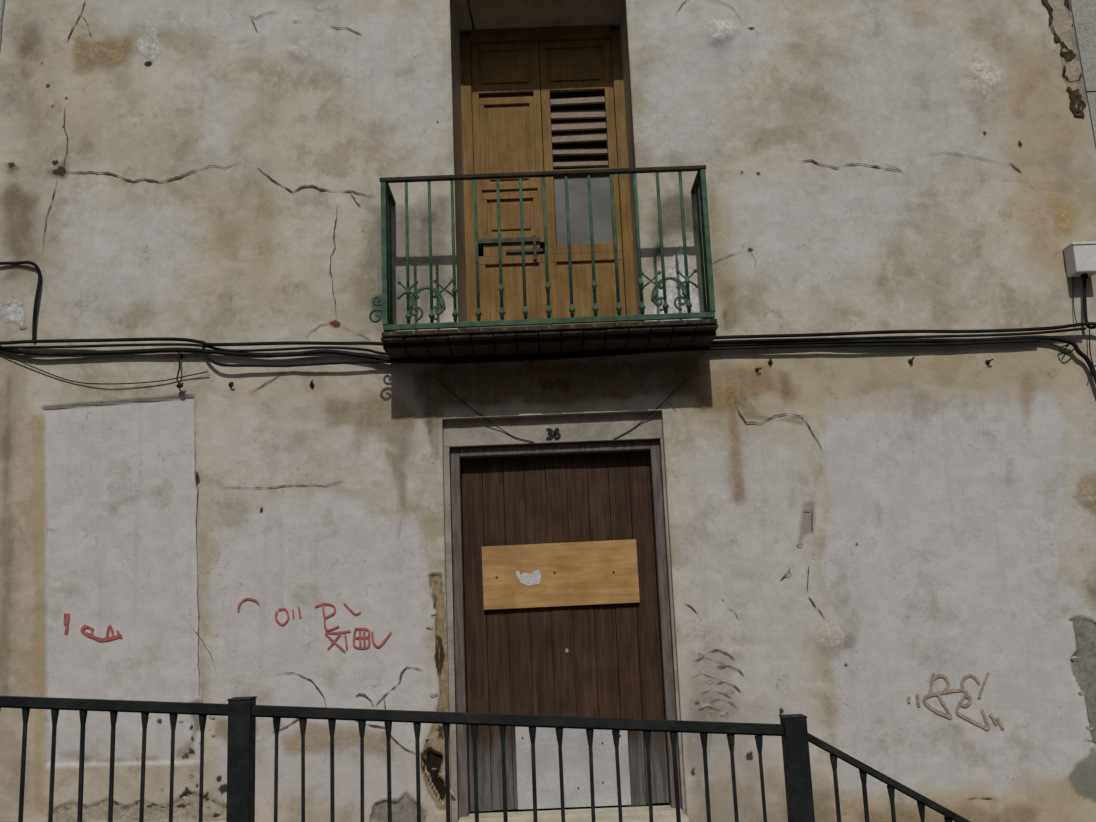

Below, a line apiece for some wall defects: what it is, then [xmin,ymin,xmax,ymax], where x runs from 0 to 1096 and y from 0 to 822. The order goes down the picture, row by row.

peeling [1042,0,1086,117]
crack [787,157,904,172]
crack [42,108,372,338]
crack [276,672,326,706]
crack [356,667,424,754]
spalling [421,574,455,810]
spalling [1069,617,1096,800]
spalling [53,774,227,822]
spalling [369,795,425,822]